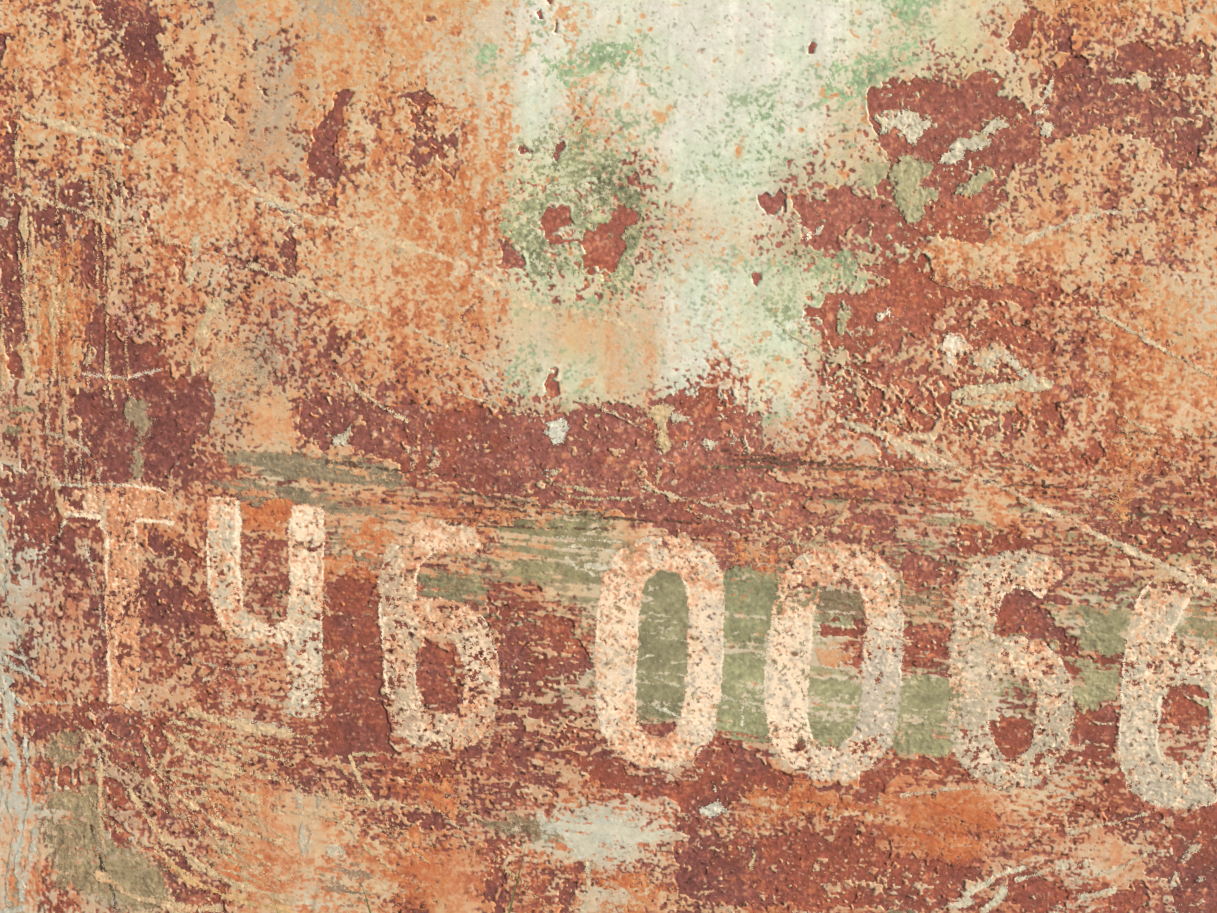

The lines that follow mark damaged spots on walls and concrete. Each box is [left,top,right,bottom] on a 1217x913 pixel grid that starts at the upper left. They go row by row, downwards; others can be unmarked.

rust [291,0,493,112]
peeling [1006,12,1037,53]
rust [17,238,93,377]
rust [397,161,504,347]
peeling [540,205,640,275]
peeling [757,22,1215,471]
peeling [298,367,897,551]
rust [1076,265,1208,532]
peeling [898,525,1059,588]
peeling [321,577,558,807]
rust [363,741,469,913]
rust [740,777,1015,866]